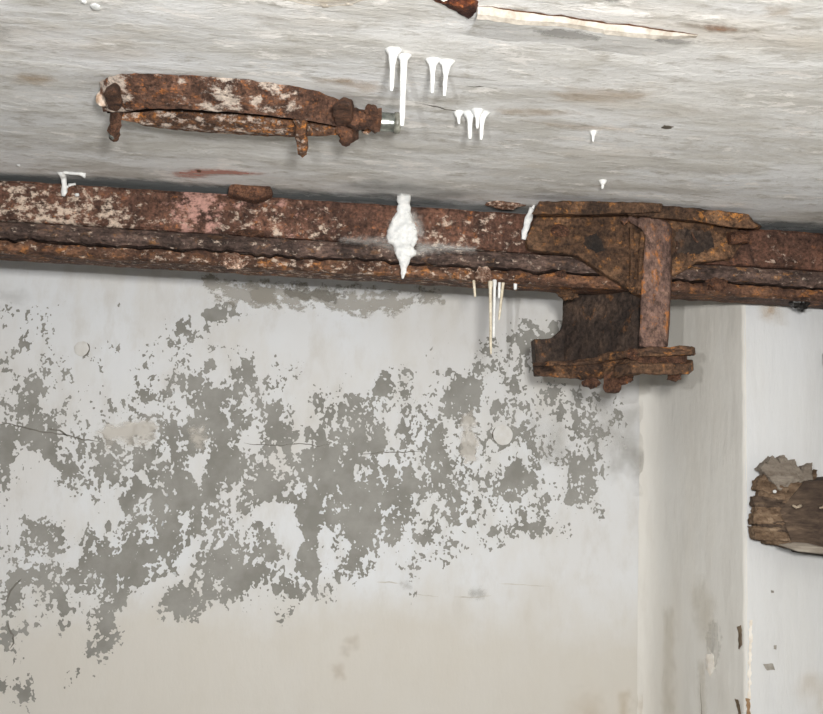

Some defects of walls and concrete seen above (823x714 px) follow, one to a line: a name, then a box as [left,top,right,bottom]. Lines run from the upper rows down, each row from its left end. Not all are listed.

spalling [285,0,362,8]
crack [467,3,725,56]
rust [0,239,399,265]
peeling [0,301,628,665]
peeling [0,673,36,713]
spalling [735,620,753,714]